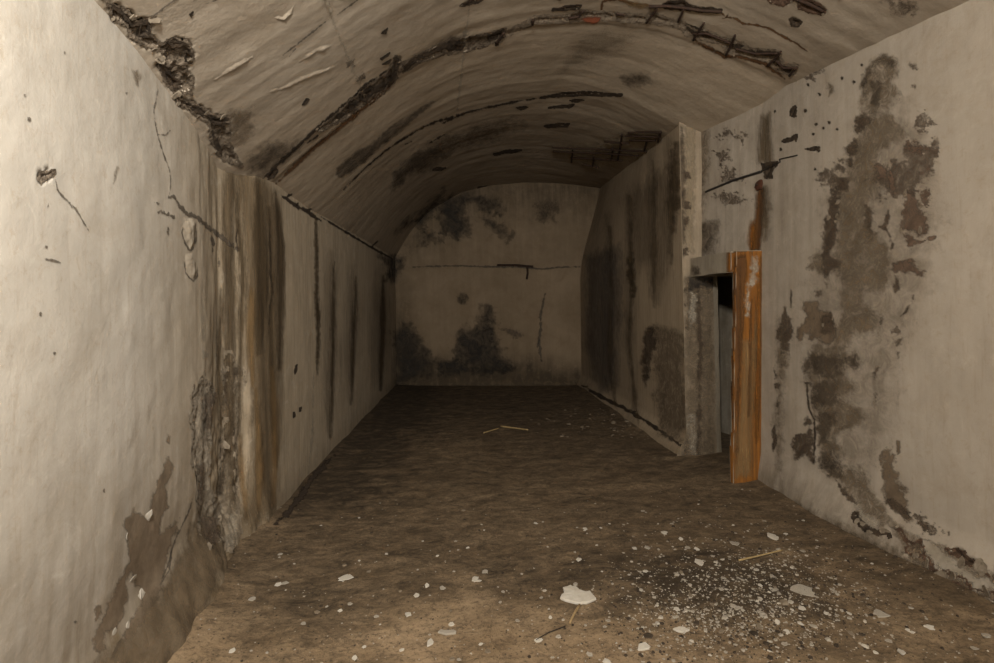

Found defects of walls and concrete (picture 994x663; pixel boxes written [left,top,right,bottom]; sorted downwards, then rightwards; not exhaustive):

spalling [103,0,244,168]
spalling [315,0,799,132]
spalling [767,0,827,27]
crack [48,184,86,226]
leakage [101,145,291,663]
crack [154,91,239,265]
leakage [314,219,335,416]
leakage [379,284,521,388]
rust [724,188,770,484]
leakage [804,56,903,526]
peeling [92,457,178,652]
flaking render [851,441,994,602]